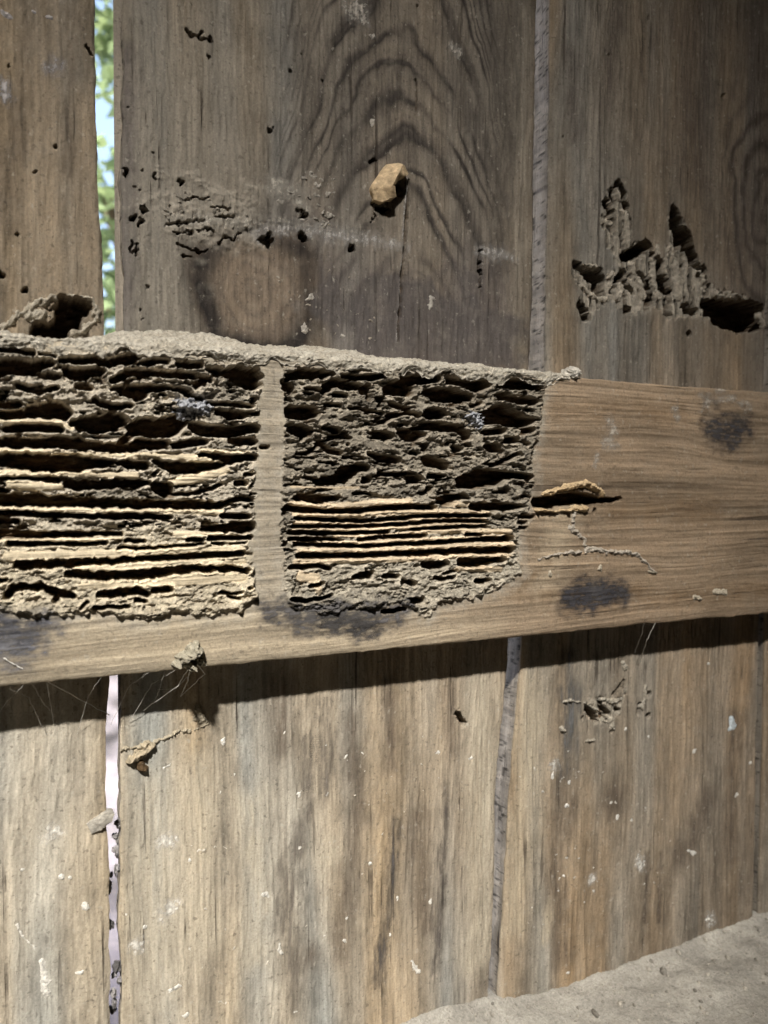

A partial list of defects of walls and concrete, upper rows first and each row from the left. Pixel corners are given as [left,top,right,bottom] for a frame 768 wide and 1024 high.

spalling [572,178,766,338]
spalling [0,293,271,612]
water stain [701,389,752,451]
spalling [280,366,622,615]
water stain [560,574,630,615]
spalling [562,660,628,735]
peeling [636,684,652,718]